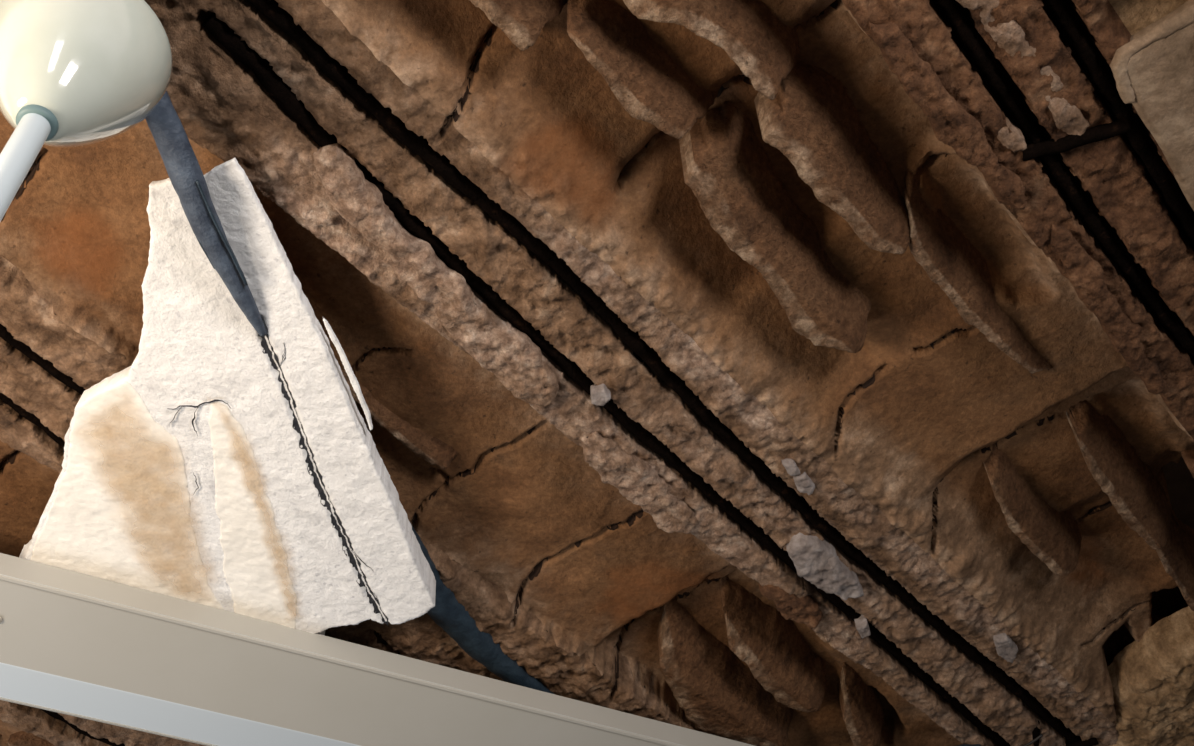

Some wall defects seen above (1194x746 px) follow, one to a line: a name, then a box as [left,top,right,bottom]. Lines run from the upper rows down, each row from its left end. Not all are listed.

spalling [0,112,15,153]
crack [2,149,47,220]
flaking render [0,119,506,682]
spalling [247,0,1194,746]
crack [834,373,875,437]
crack [981,415,1054,453]
damp [93,411,198,591]
damp [235,436,268,518]
crack [411,447,495,524]
crack [607,510,643,530]
crack [513,540,582,619]
spalling [0,700,206,746]